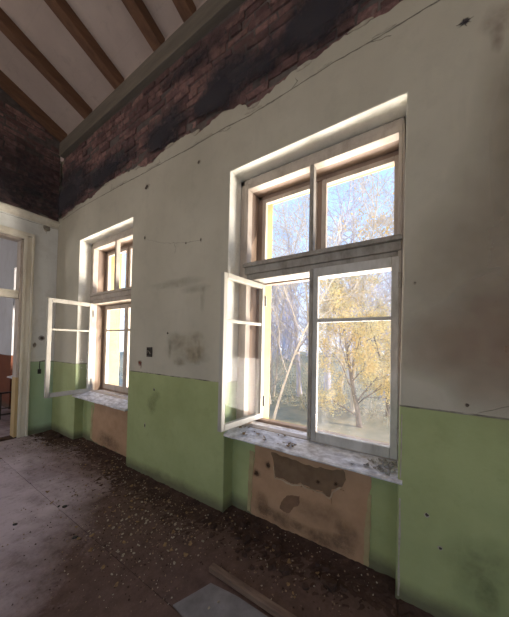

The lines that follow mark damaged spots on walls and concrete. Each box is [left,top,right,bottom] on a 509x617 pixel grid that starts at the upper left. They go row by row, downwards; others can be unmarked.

flaking render [0,0,403,232]
crack [1,0,440,233]
peeling [90,403,128,467]
peeling [247,445,372,567]